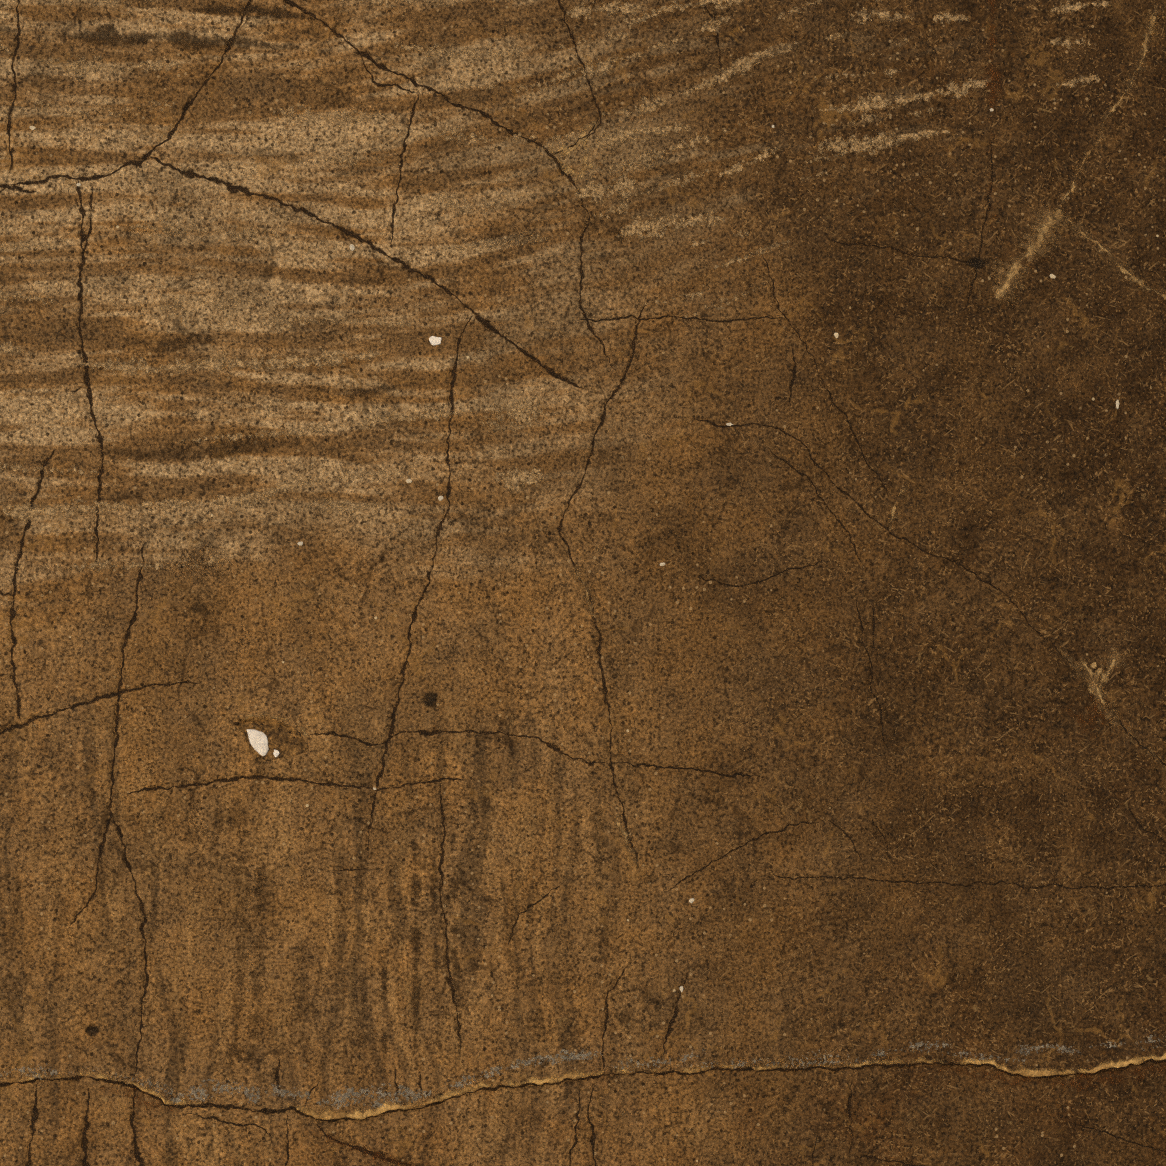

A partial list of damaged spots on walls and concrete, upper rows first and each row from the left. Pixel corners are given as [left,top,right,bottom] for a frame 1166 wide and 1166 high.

crack [0,0,888,1166]